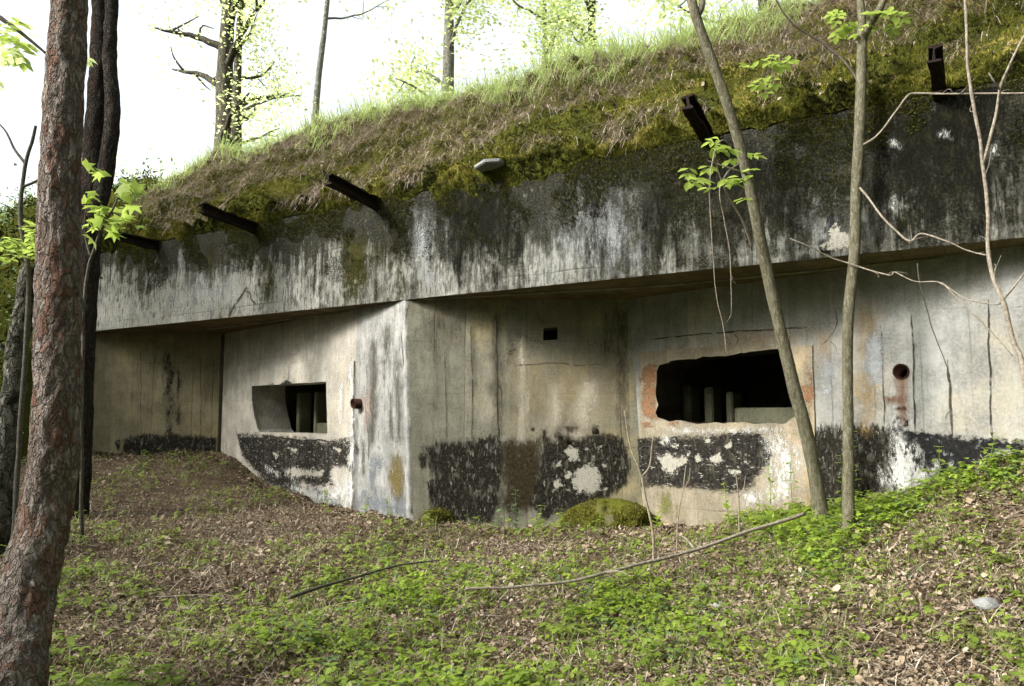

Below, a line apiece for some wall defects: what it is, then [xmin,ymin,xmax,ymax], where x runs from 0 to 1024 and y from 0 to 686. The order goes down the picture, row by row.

damp [436,181,521,290]
damp [574,204,620,264]
damp [639,183,689,268]
damp [695,146,810,258]
damp [863,83,1024,241]
damp [162,353,180,437]
damp [291,328,401,503]
crack [655,310,838,354]
rust [886,380,906,423]
damp [881,417,936,494]
crack [909,316,917,428]
crack [986,300,994,439]